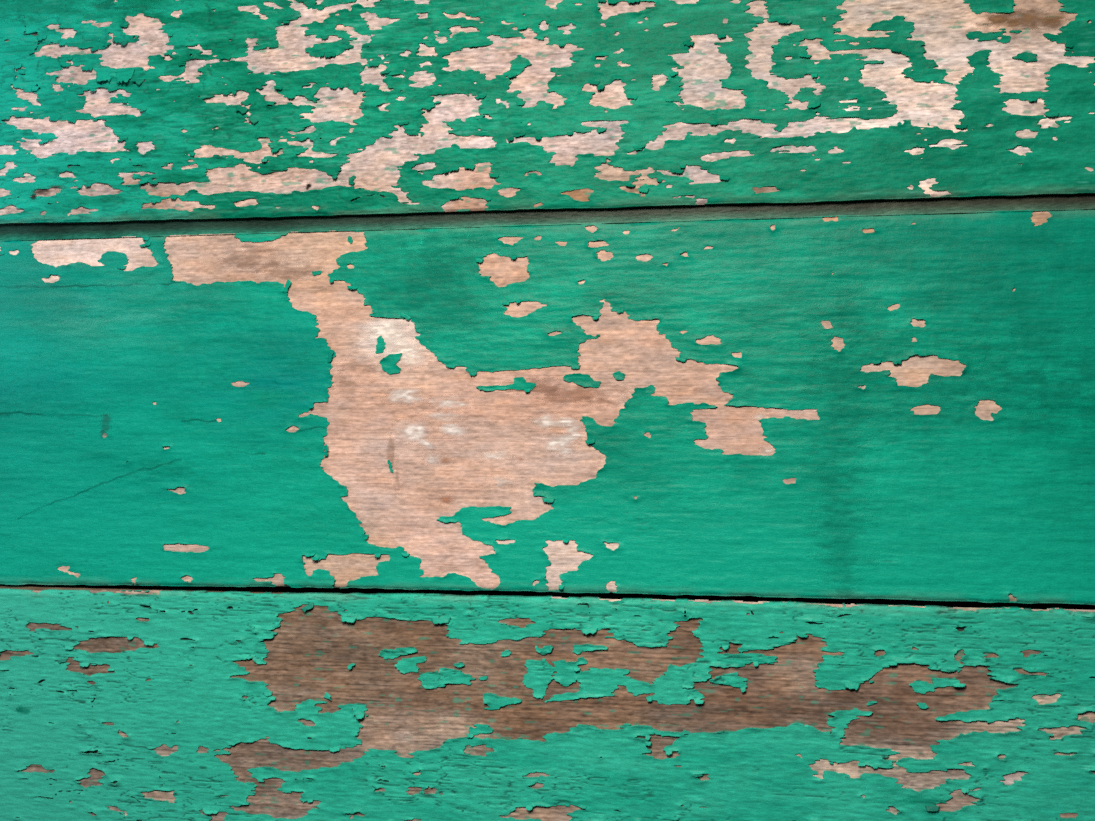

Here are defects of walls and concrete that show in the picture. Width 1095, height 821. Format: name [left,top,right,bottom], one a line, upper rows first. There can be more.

peeling [0,0,1095,216]
peeling [585,225,613,261]
peeling [860,354,966,387]
peeling [0,231,820,590]
peeling [910,404,940,415]
peeling [974,400,1002,421]
peeling [600,581,622,601]
peeling [950,593,1017,611]
peeling [196,602,1049,821]
peeling [1032,693,1061,704]
peeling [1038,711,1095,755]
peeling [141,790,176,803]